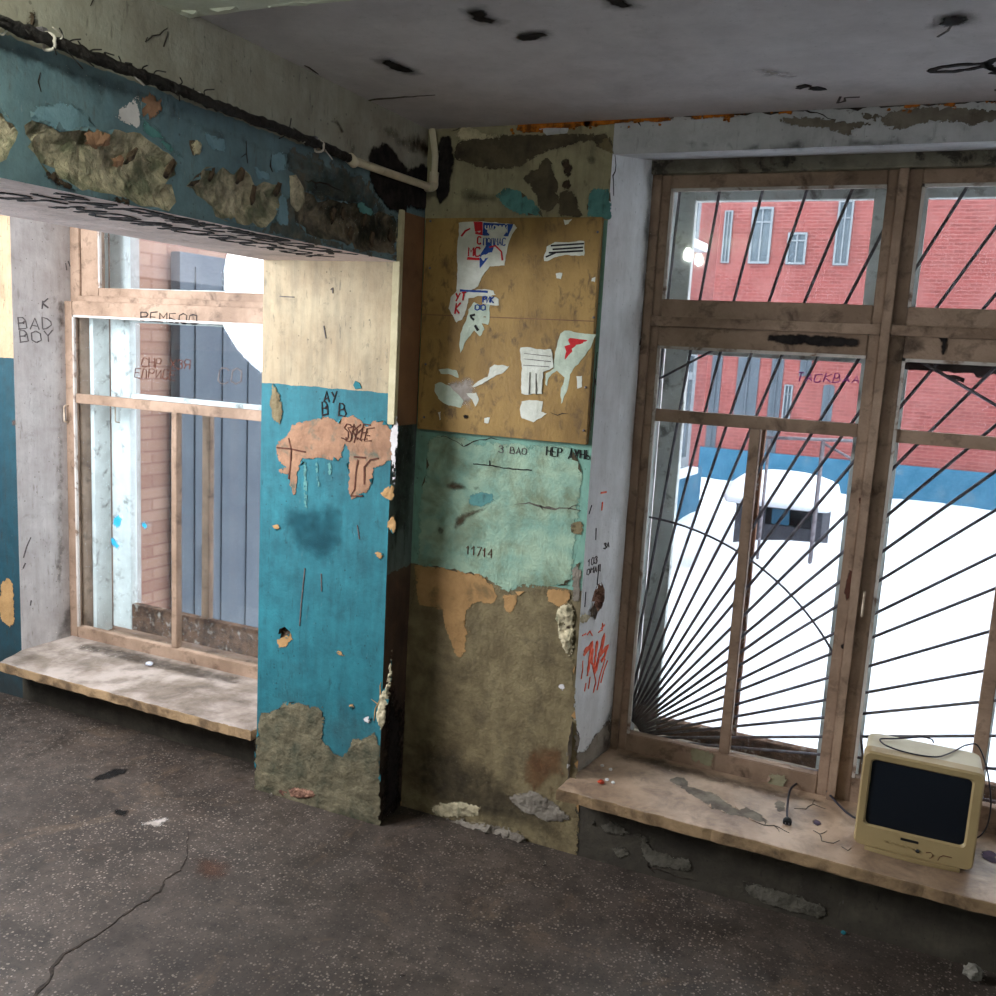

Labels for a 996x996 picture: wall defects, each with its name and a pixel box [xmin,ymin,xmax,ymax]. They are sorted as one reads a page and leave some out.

spalling [0,92,178,211]
peeling [189,133,226,156]
spalling [186,152,398,259]
corrosion [691,113,746,122]
peeling [776,107,996,137]
peeling [270,384,399,510]
peeling [0,578,15,626]
peeling [401,435,611,855]
peeling [254,650,393,826]
leakage [382,690,405,816]
crack [33,835,189,996]